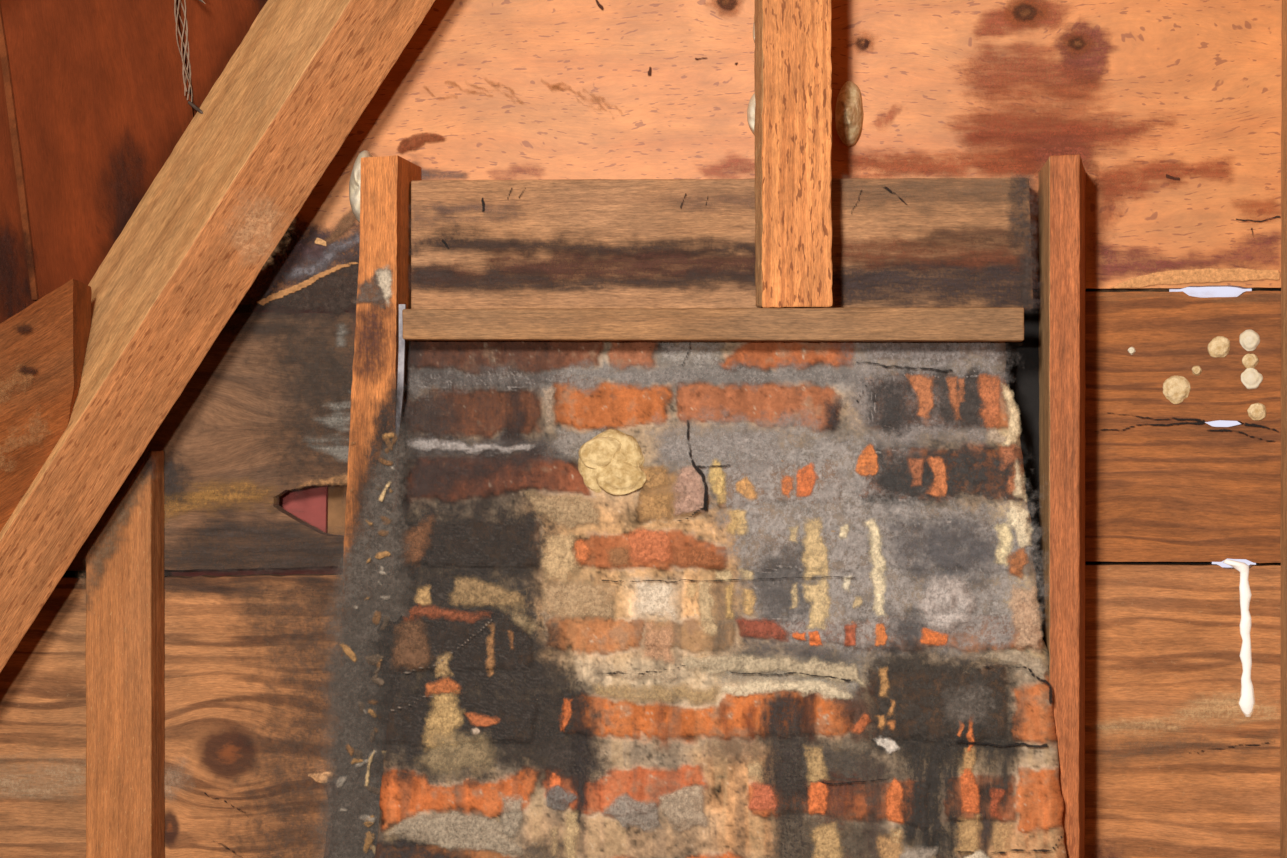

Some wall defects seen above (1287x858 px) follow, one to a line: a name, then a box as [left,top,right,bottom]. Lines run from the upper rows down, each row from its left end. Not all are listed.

damp [965,0,1111,99]
damp [421,169,464,179]
damp [849,115,1228,219]
damp [1097,235,1278,280]
crack [678,421,729,521]
crack [1095,413,1279,442]